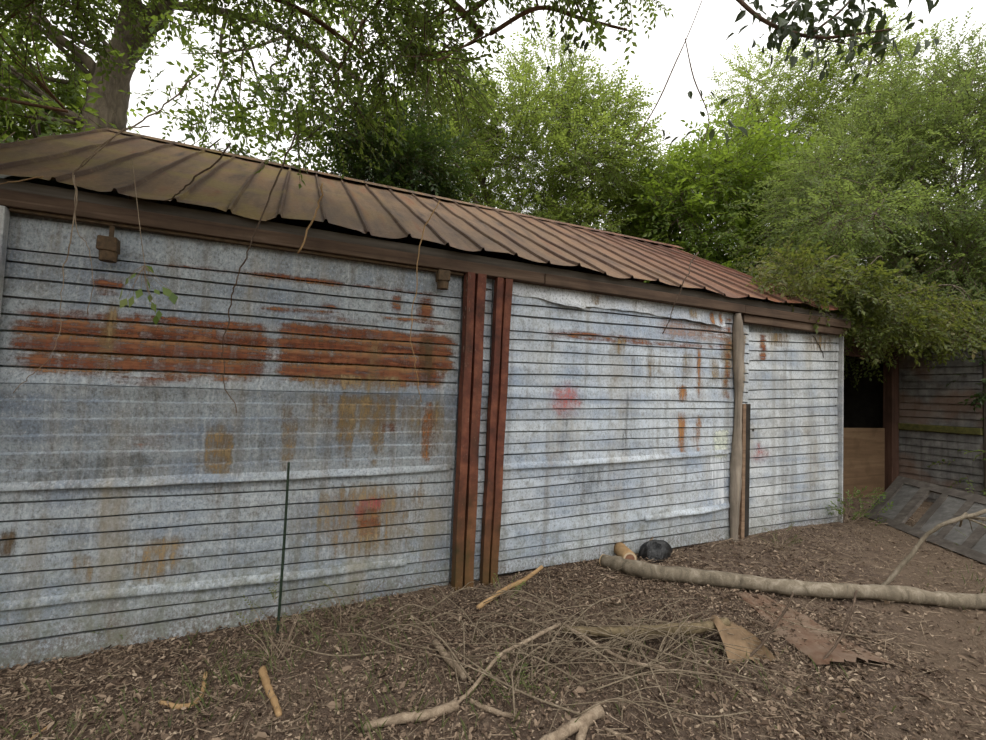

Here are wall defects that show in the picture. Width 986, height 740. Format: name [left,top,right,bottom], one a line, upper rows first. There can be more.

rust [94,278,123,295]
rust [253,272,343,286]
rust [11,285,456,466]
rust [318,484,407,552]